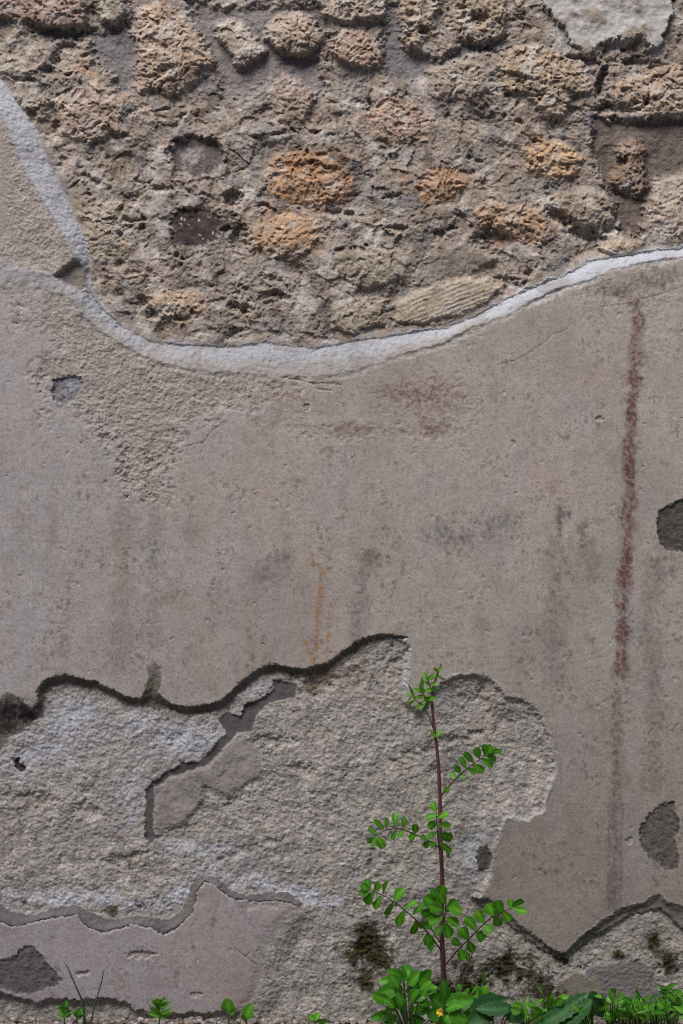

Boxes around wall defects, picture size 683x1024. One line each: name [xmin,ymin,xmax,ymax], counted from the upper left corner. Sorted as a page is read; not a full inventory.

spalling [0,0,683,348]
peeling [4,282,311,504]
spalling [657,500,683,554]
spalling [0,633,683,1022]